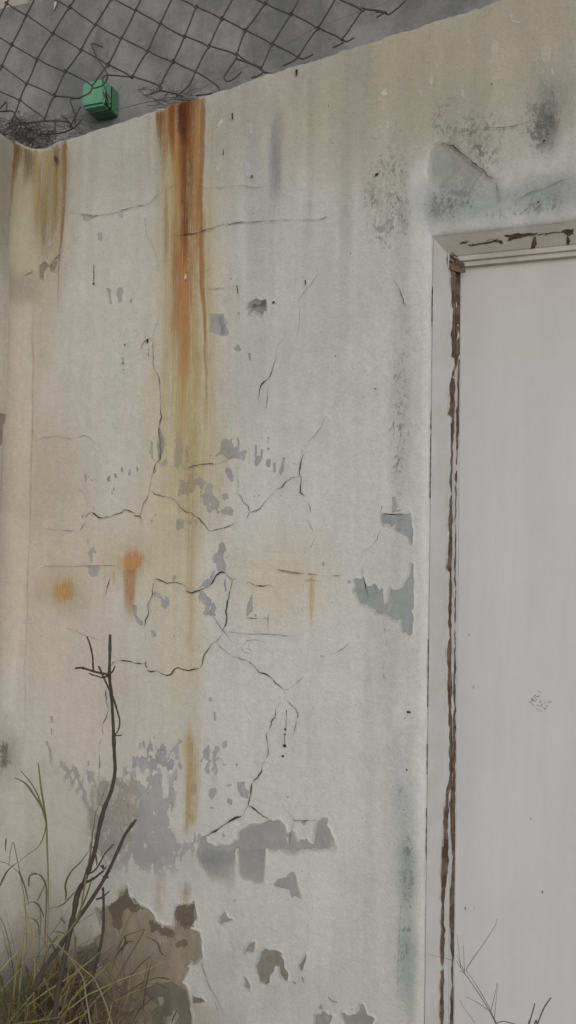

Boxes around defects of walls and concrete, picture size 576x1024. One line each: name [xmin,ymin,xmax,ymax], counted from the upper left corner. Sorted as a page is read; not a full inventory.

corrosion [12,142,67,255]
corrosion [158,99,206,469]
corrosion [124,554,141,607]
crack [45,316,326,544]
peeling [150,427,285,516]
peeling [348,561,418,638]
peeling [380,497,416,547]
corrosion [427,229,573,1024]
crack [66,571,313,843]
peeling [46,716,340,866]
spalling [72,882,207,1024]
spalling [242,939,310,991]